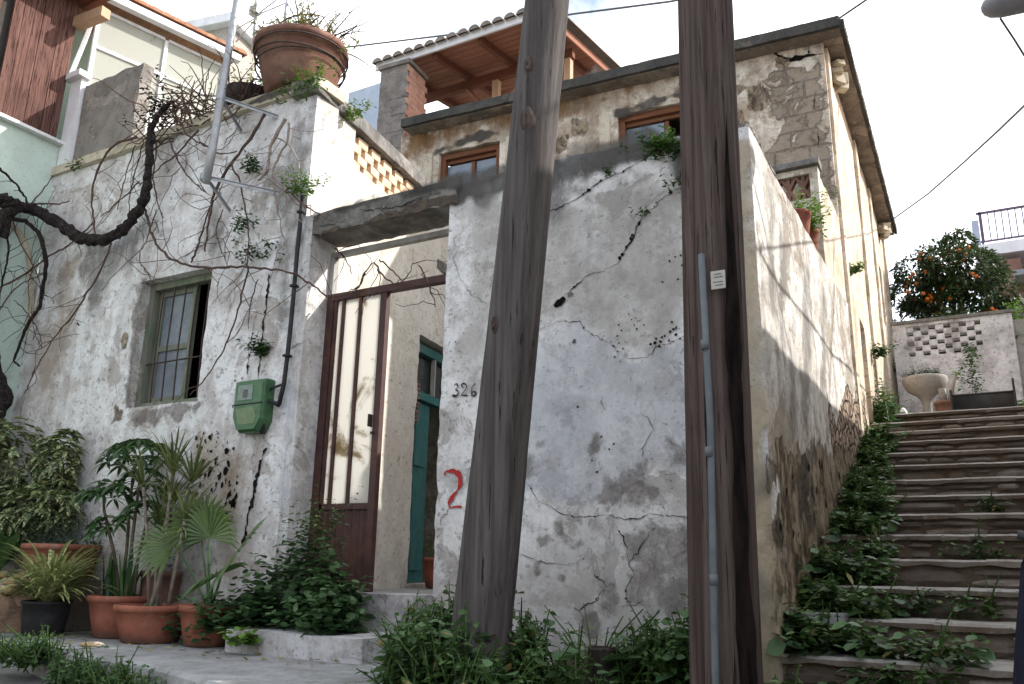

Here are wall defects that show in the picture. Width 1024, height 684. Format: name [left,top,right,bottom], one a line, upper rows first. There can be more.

crack [550,152,653,211]
peeling [736,54,840,199]
crack [539,188,684,359]
crack [241,448,267,547]
crack [520,483,685,633]
peeling [765,436,853,626]